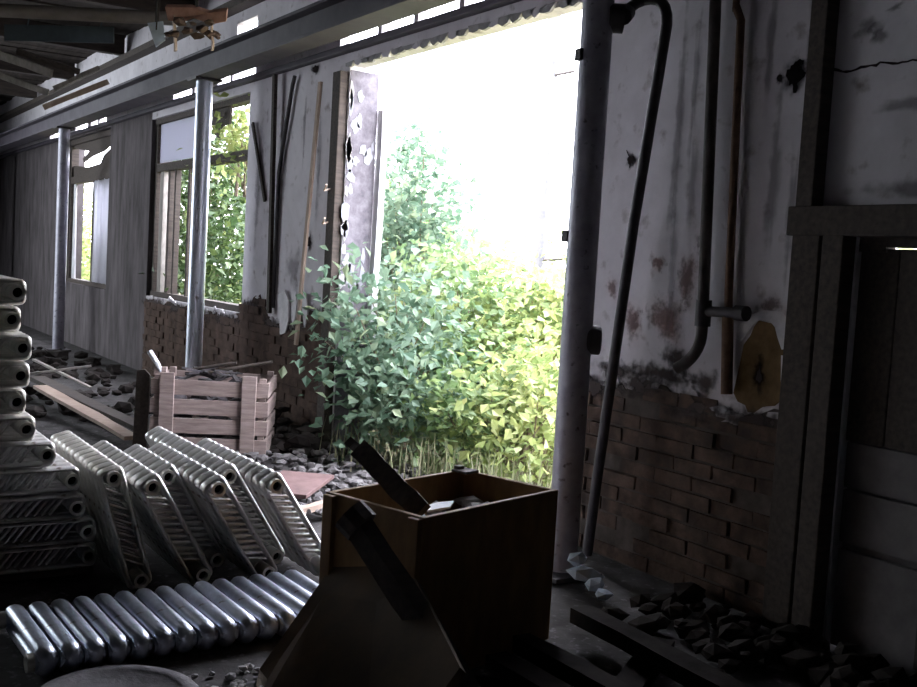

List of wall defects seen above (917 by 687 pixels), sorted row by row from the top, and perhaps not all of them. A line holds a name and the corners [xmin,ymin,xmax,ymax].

crack [833,59,917,73]
peeling [337,80,374,315]
leakage [600,349,716,395]
flaking render [578,299,786,617]